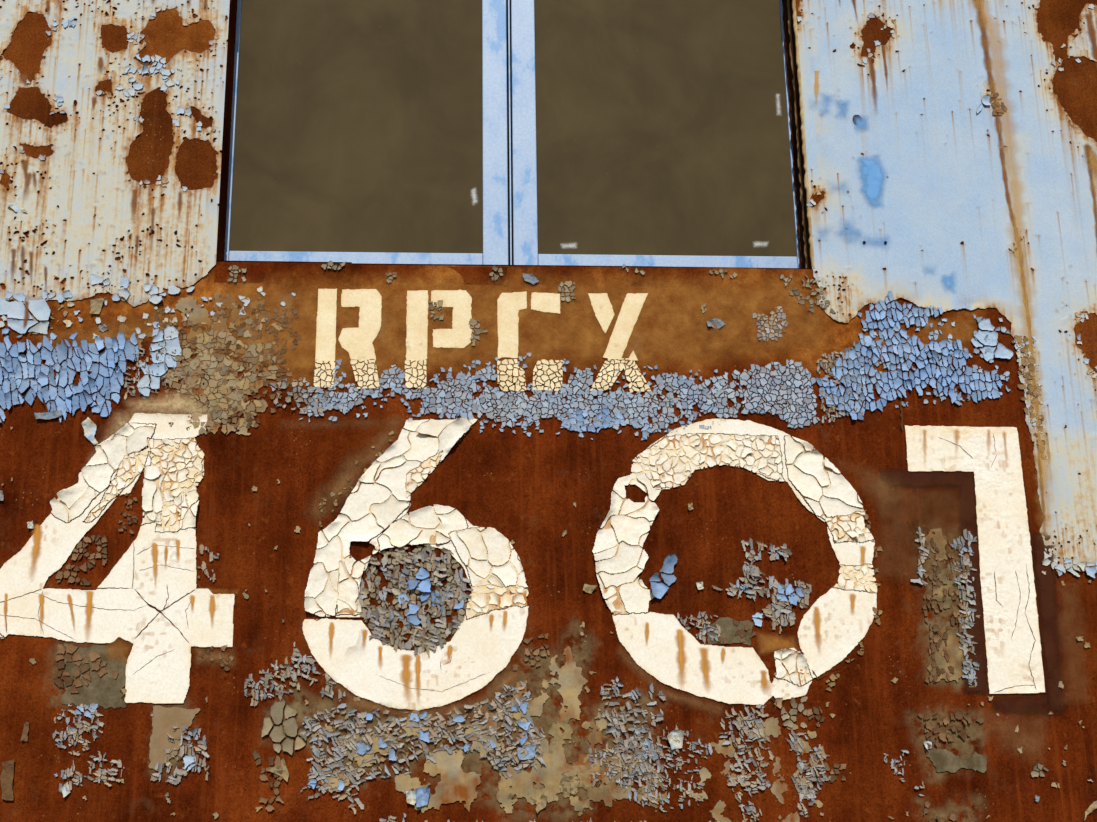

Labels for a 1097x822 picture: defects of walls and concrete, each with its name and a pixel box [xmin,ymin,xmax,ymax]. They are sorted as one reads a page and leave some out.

rust [0,0,68,129]
rust [92,0,219,107]
rust [126,87,218,212]
rust [1035,0,1097,237]
rust [190,286,816,372]
peeling [0,265,1048,657]
crack [1,542,195,675]
peeling [910,527,981,687]
rust [880,470,1062,713]
peeling [53,643,127,800]
peeling [148,696,209,816]
peeling [244,633,851,822]